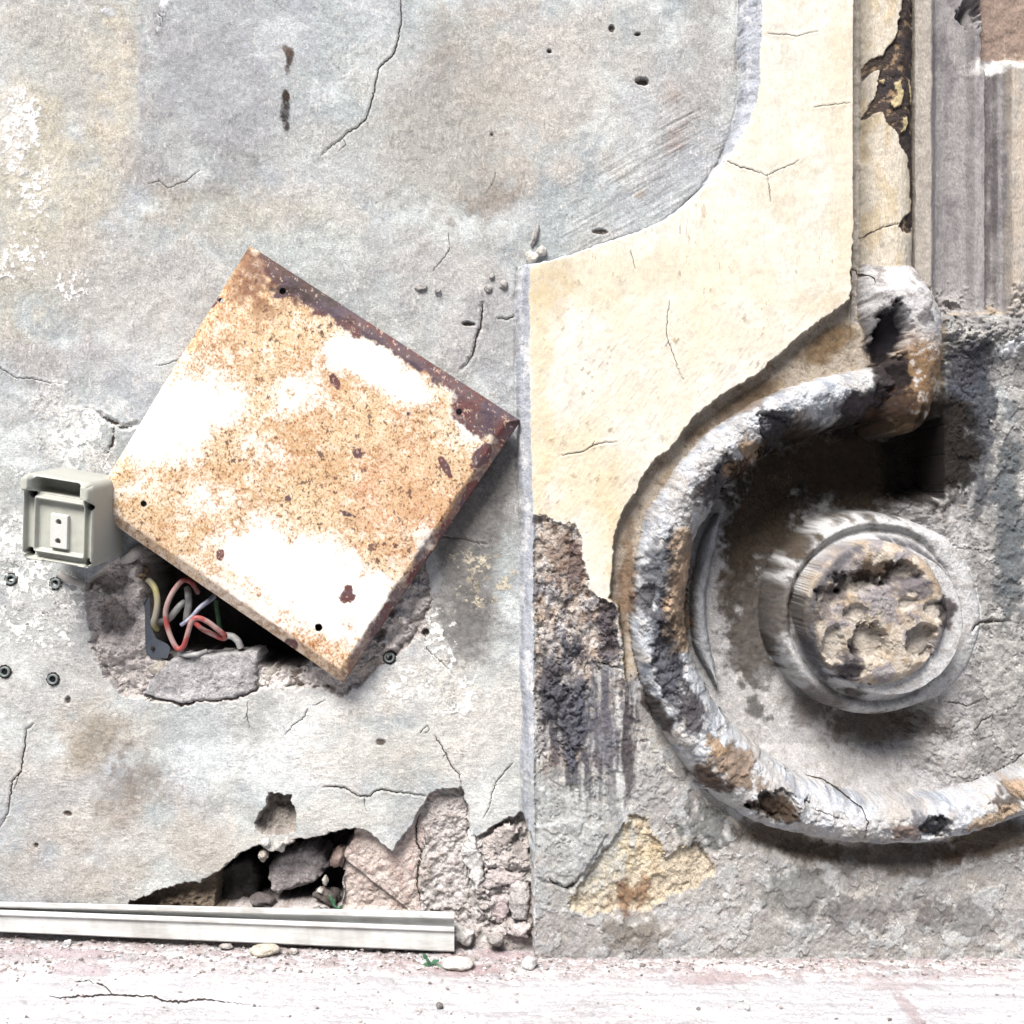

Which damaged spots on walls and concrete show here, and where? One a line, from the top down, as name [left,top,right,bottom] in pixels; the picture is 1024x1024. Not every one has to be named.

crack [326,0,402,151]
peeling [861,0,913,235]
spalling [0,512,478,718]
peeling [534,515,624,772]
crack [0,724,33,826]
spalling [129,787,538,971]
crack [323,786,426,907]
leakage [519,637,636,887]
spalling [566,814,716,918]
crack [49,980,244,1005]